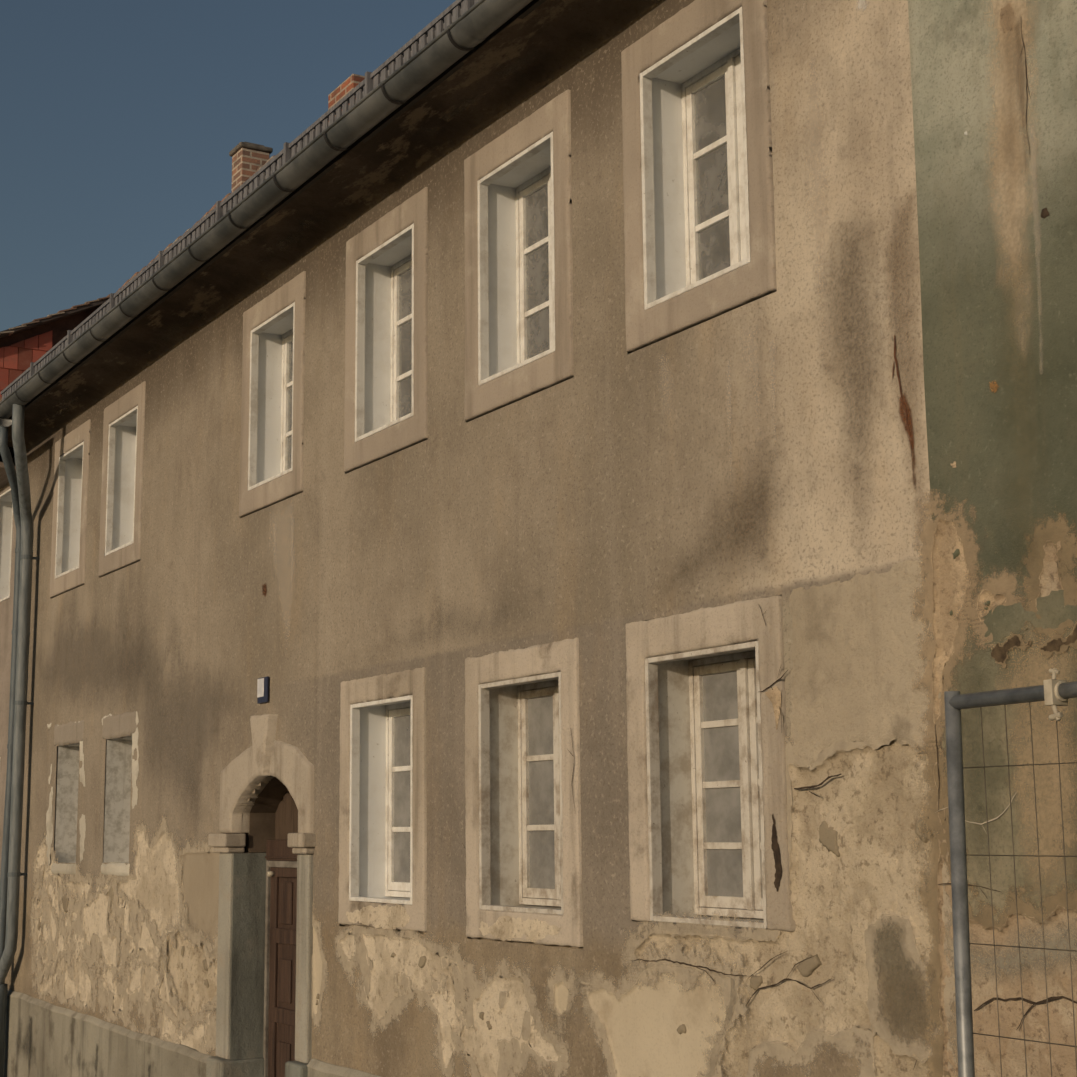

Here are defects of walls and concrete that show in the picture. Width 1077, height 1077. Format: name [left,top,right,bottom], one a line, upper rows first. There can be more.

leakage [993,0,1030,294]
corrosion [899,395,916,484]
flaking render [30,764,220,1055]
flaking render [311,490,1077,1077]
crack [634,952,831,1006]
crack [974,996,1077,1030]